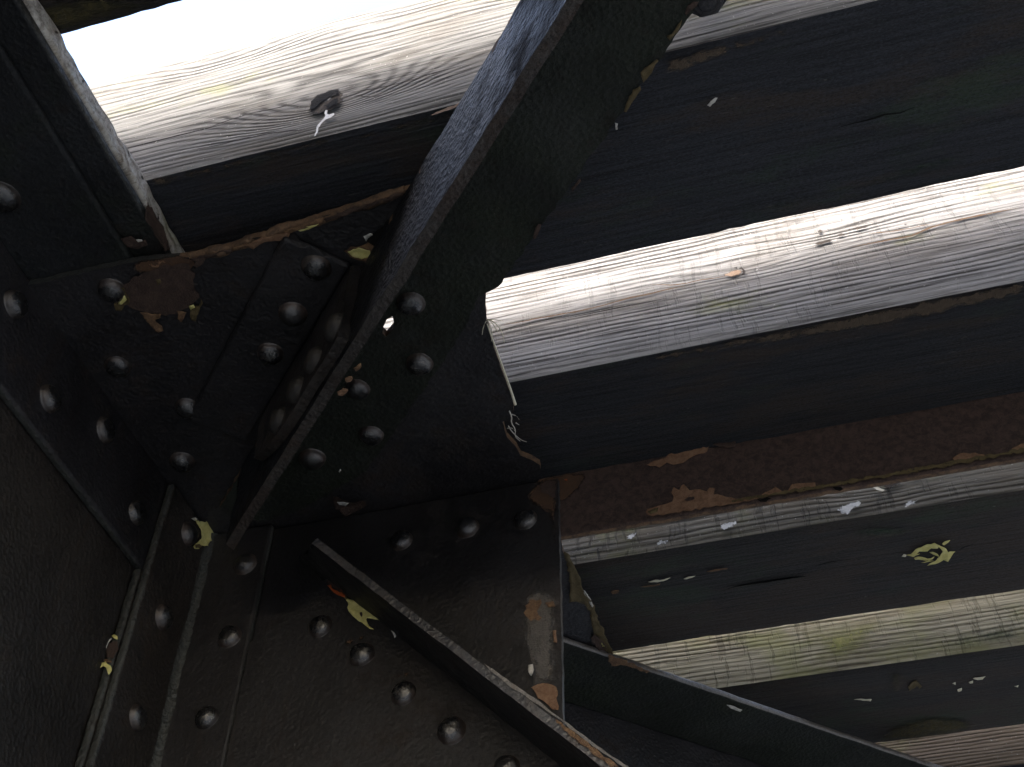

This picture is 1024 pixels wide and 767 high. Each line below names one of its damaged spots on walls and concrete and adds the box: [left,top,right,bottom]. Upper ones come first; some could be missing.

rust [114,186,406,333]
rust [647,441,737,468]
rust [646,482,816,516]
peeling [191,518,214,549]
peeling [327,580,378,629]